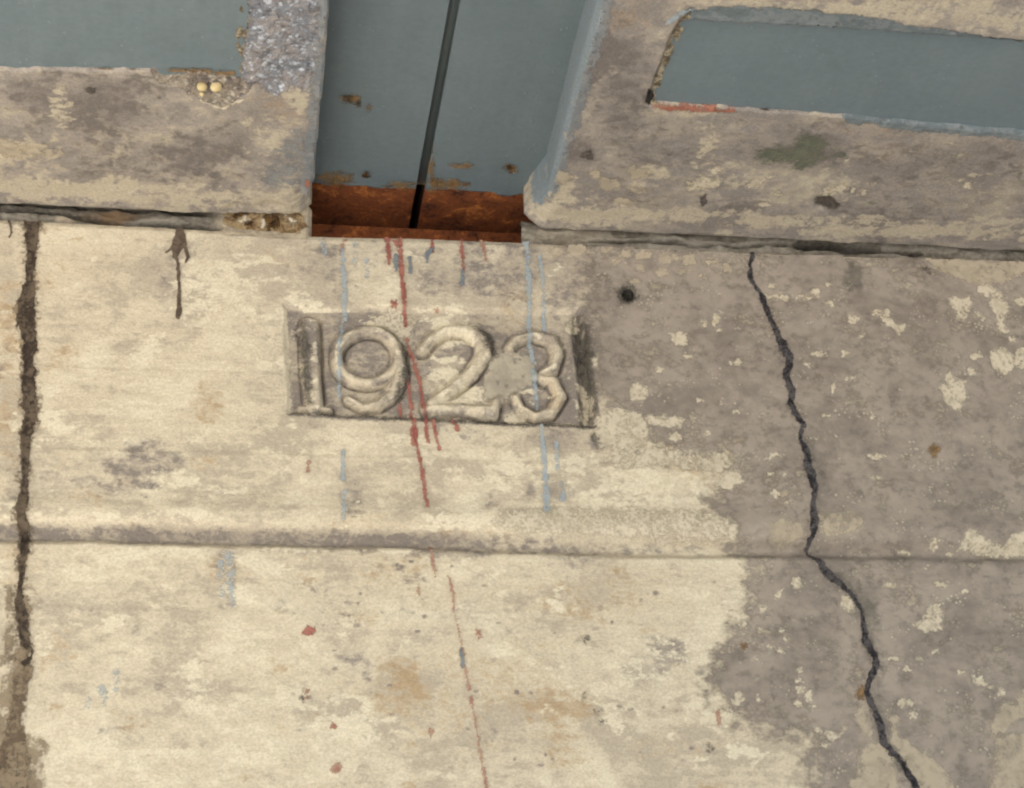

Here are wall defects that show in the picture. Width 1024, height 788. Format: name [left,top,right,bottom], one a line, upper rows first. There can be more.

spalling [150,0,326,110]
damp [165,227,190,319]
spalling [222,212,308,234]
rust [382,152,474,229]
damp [757,134,846,171]
crack [0,220,43,788]
damp [577,247,1024,788]
crack [747,252,920,788]